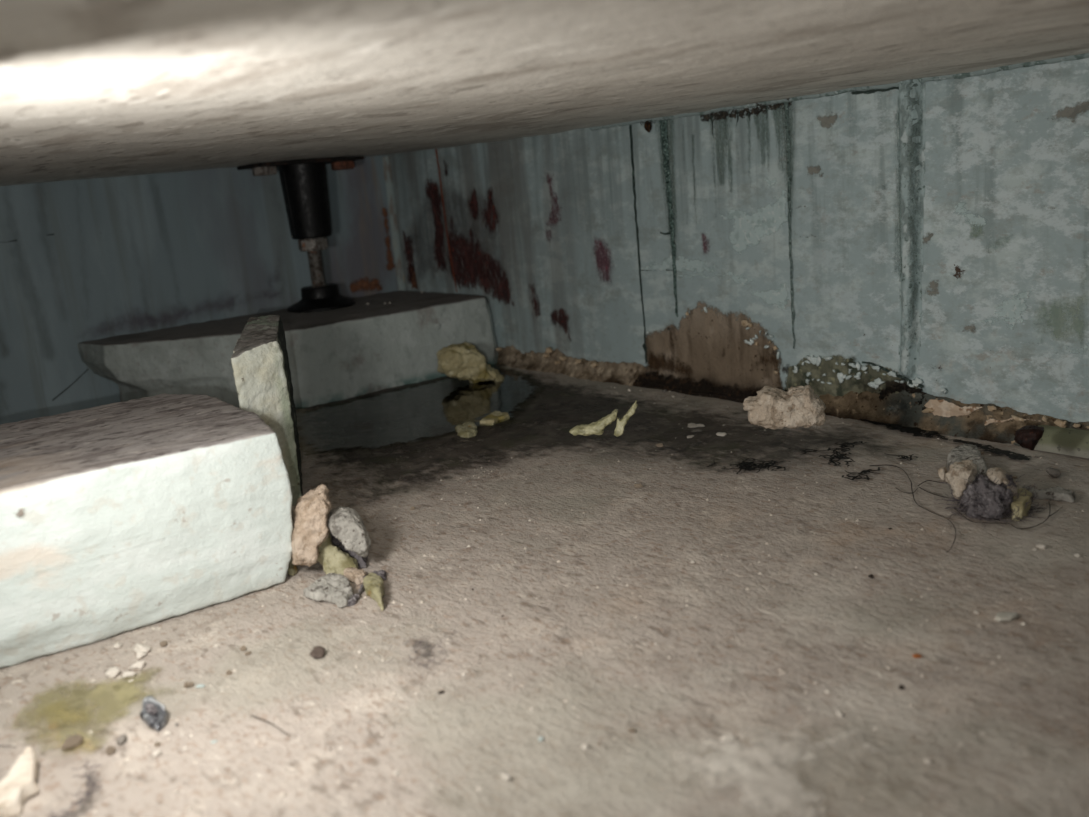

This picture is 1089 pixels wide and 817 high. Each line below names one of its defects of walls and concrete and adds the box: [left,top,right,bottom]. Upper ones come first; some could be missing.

water stain [659,119,678,317]
water stain [700,101,795,348]
peeling [569,400,638,437]
water stain [308,366,918,500]
spalling [496,301,783,392]
water stain [778,355,947,405]
spalling [819,389,1089,446]
water stain [20,672,152,750]